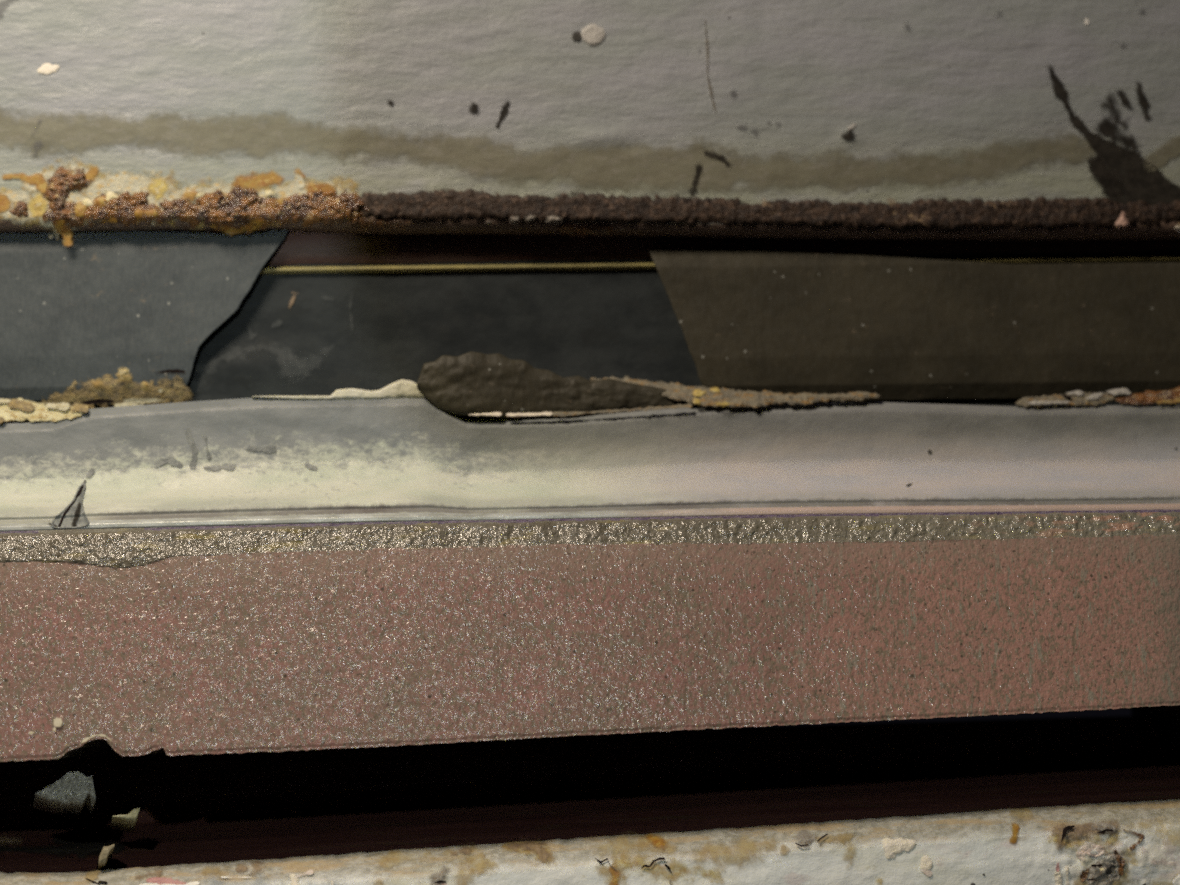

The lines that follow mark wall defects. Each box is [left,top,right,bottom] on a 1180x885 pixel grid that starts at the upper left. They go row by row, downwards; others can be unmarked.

water stain [0,111,1095,192]
water stain [1144,136,1180,172]
rust [0,162,1180,246]
peeling [114,368,164,407]
peeling [0,399,88,423]
peeling [110,807,140,832]